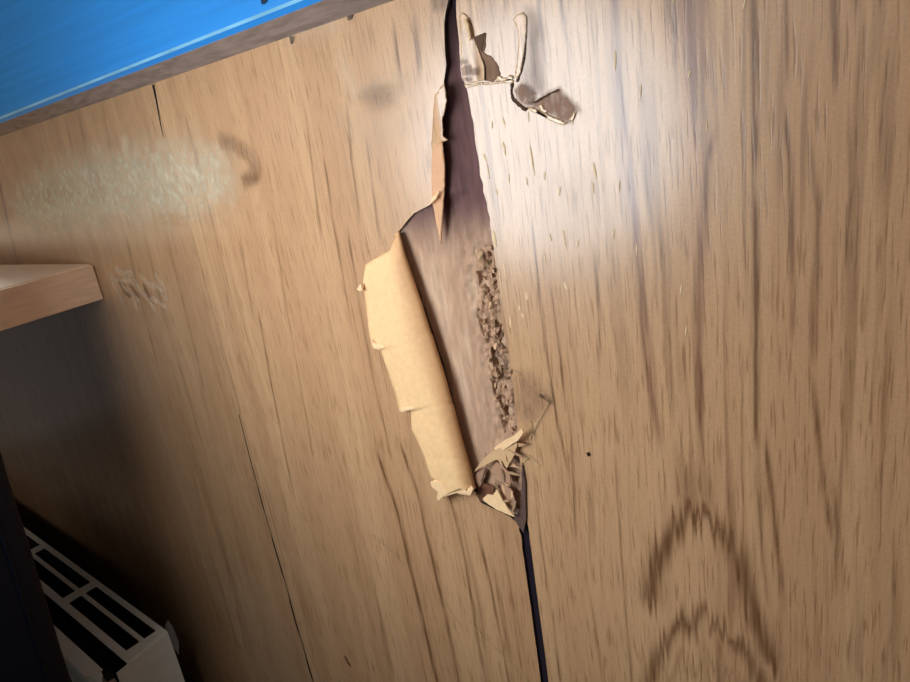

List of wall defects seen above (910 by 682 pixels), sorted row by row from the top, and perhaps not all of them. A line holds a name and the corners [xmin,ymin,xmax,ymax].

crack [152,85,163,135]
crack [451,0,459,29]
peeling [459,13,501,83]
spalling [473,245,524,517]
crack [239,416,313,681]
crack [514,463,548,682]